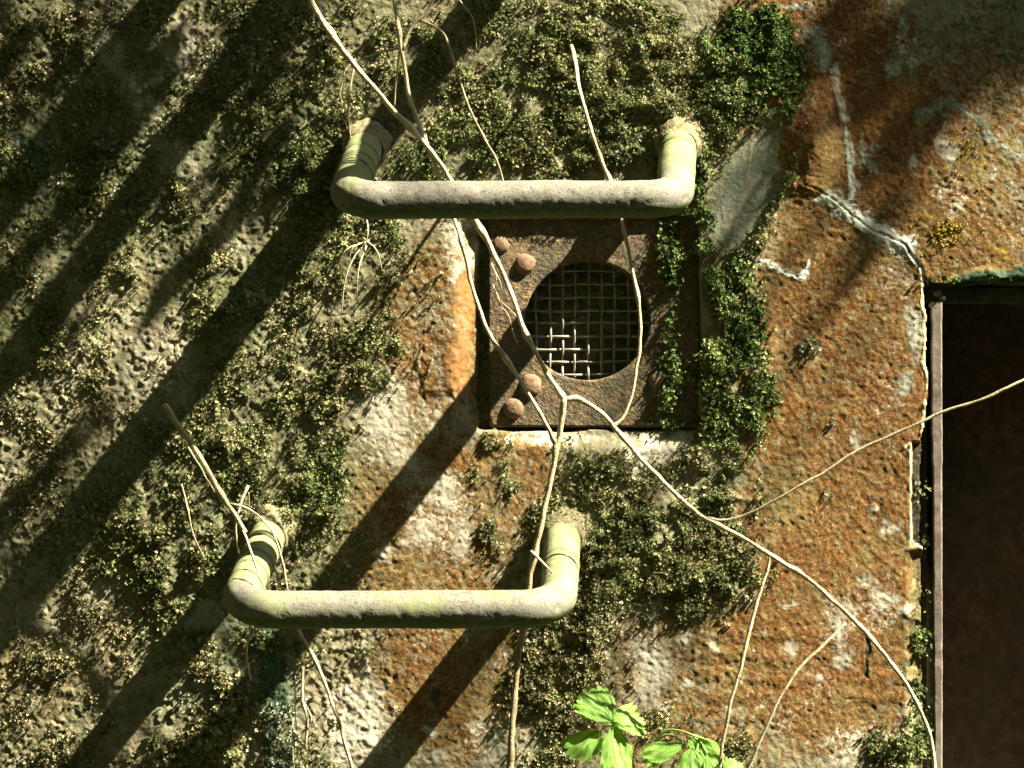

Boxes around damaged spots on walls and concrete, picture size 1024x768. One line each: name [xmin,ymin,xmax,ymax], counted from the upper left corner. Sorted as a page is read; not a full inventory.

crack [812,143,925,281]
corrosion [445,263,475,396]